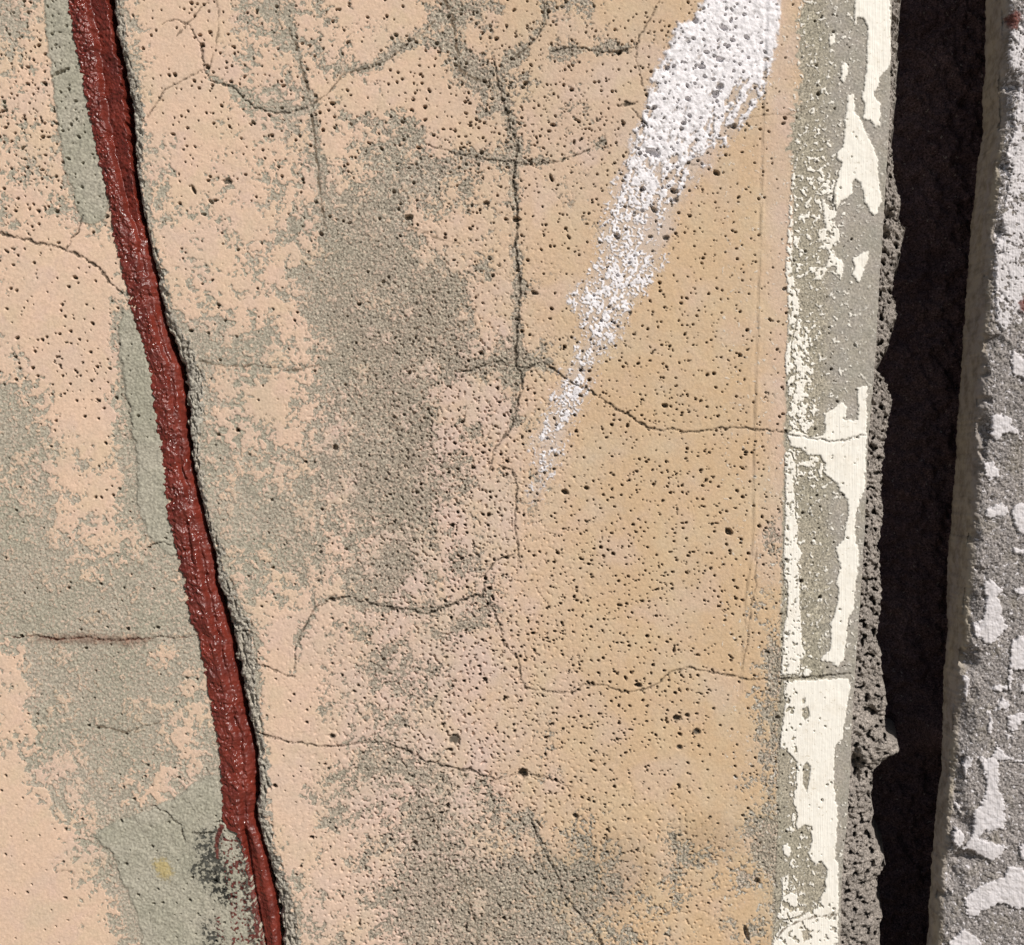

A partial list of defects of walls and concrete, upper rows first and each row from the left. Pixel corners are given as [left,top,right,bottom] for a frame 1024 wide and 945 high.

peeling [120,0,156,104]
crack [2,0,757,945]
peeling [140,0,905,945]
damp [525,0,781,496]
peeling [942,0,1024,945]